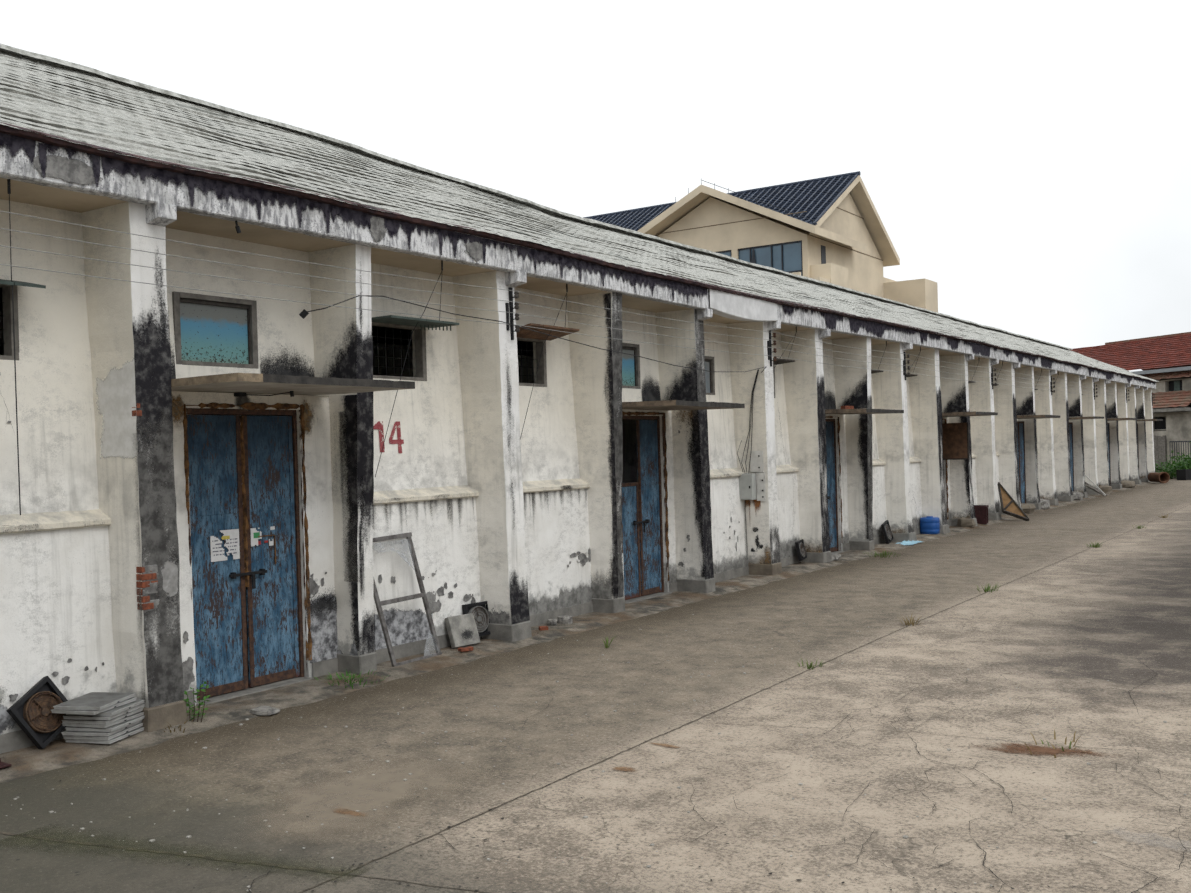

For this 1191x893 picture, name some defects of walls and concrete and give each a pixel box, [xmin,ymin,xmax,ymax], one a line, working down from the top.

damp [0,133,920,708]
flaking render [136,560,178,613]
crack [792,659,1158,891]